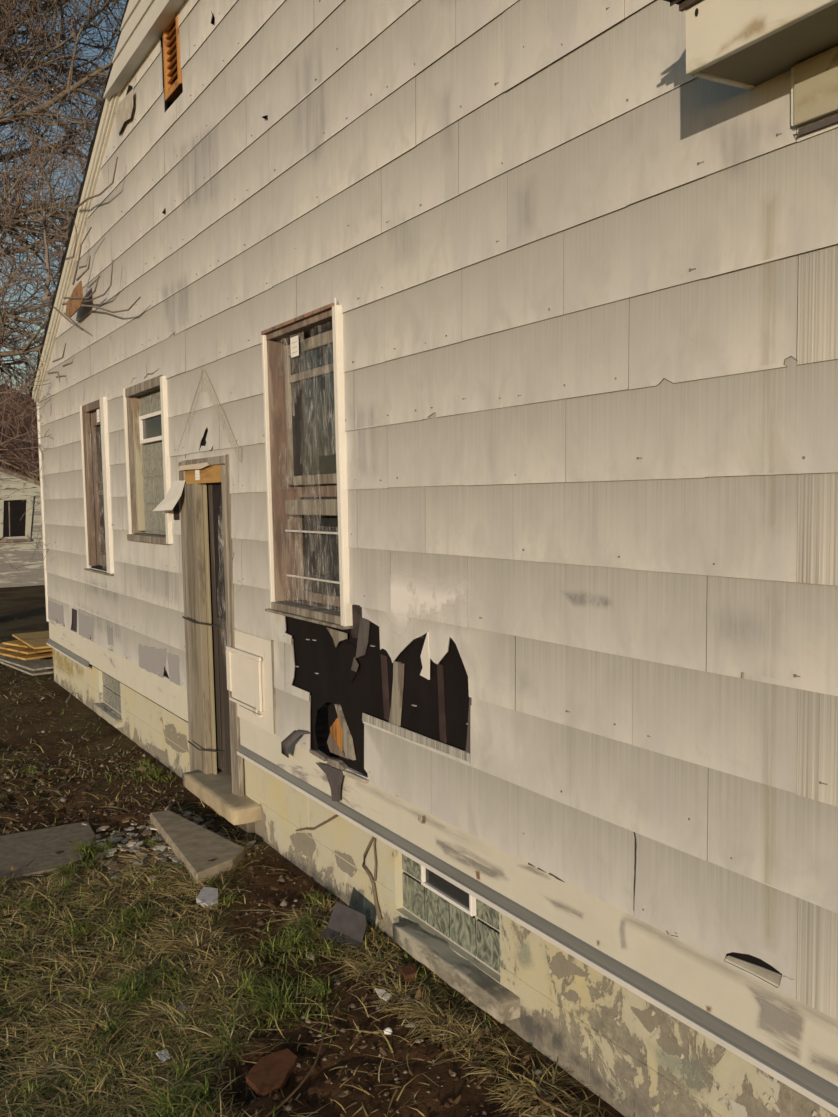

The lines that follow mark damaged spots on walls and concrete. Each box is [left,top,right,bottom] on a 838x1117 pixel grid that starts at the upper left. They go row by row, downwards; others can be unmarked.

spalling [327,702,338,734]
peeling [290,828,316,858]
peeling [332,849,357,877]
peeling [437,841,503,876]
peeling [548,948,594,1008]
spalling [726,952,782,985]
peeling [614,996,685,1059]
peeling [754,992,802,1039]
peeling [719,1094,748,1117]